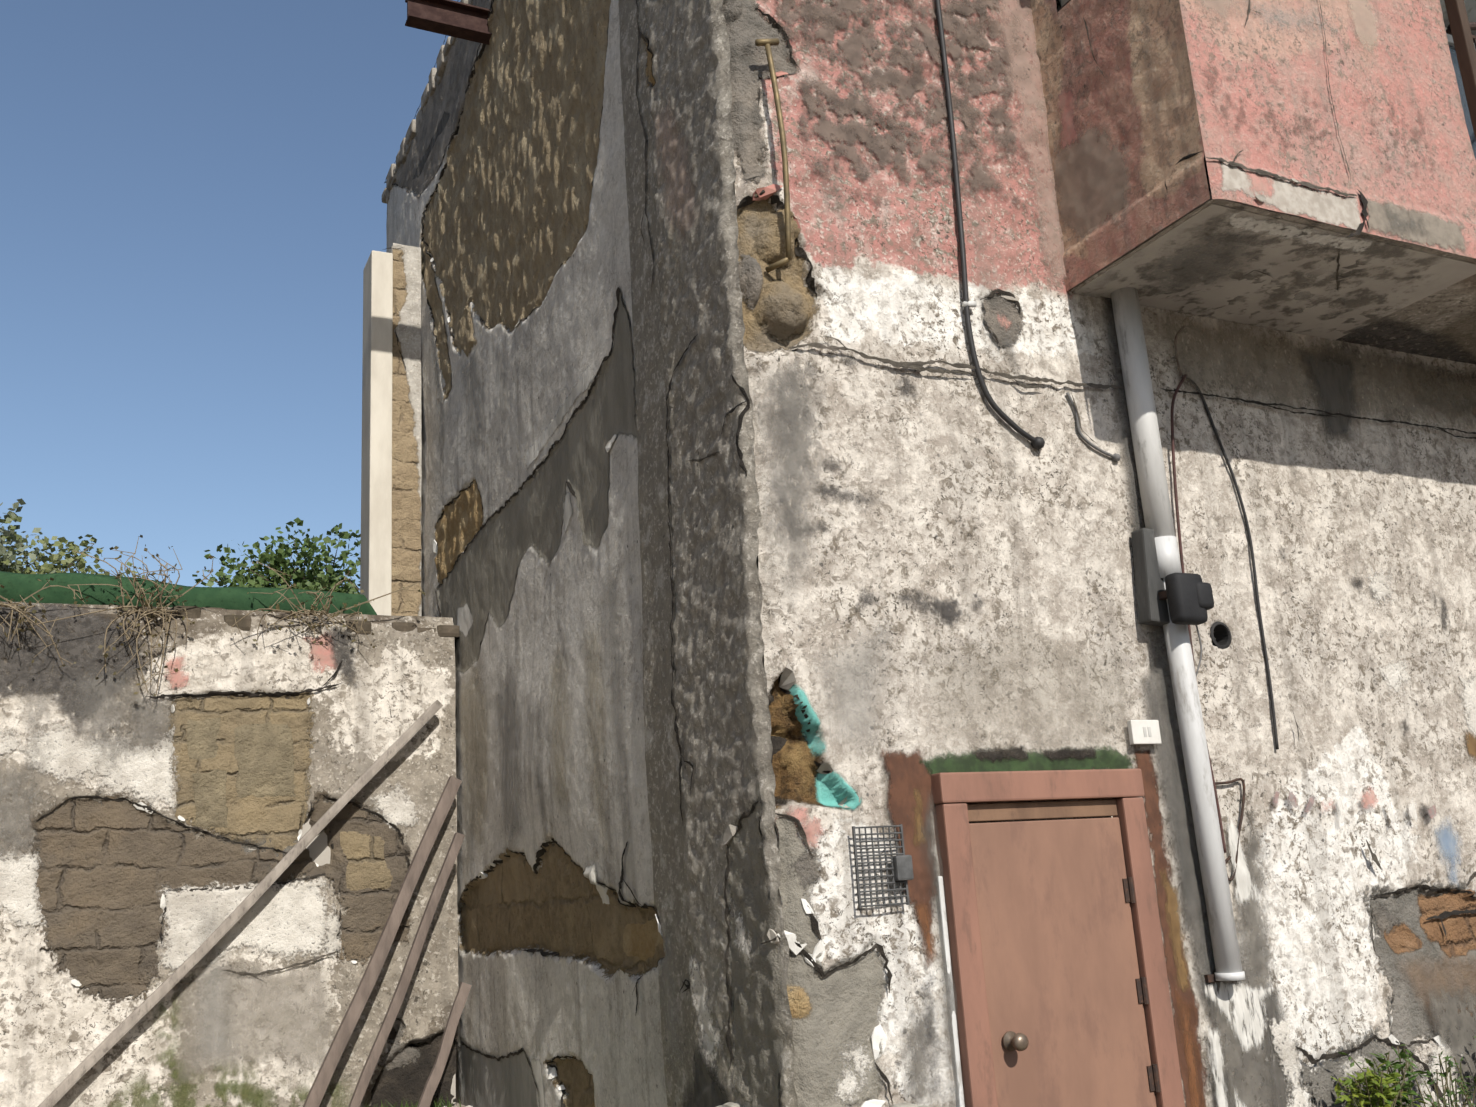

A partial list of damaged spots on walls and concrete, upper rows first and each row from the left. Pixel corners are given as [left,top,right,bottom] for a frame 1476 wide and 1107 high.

crack [636,0,654,291]
mould [776,0,1030,207]
flaking render [382,0,637,674]
crack [779,336,1124,443]
water stain [1104,297,1145,531]
water stain [1122,208,1476,437]
crack [1160,388,1476,439]
flaking render [0,657,419,1010]
flaking render [689,663,893,1107]
corrosion [881,750,937,964]
corrosion [1134,747,1207,1107]
flaking render [1269,874,1476,1107]